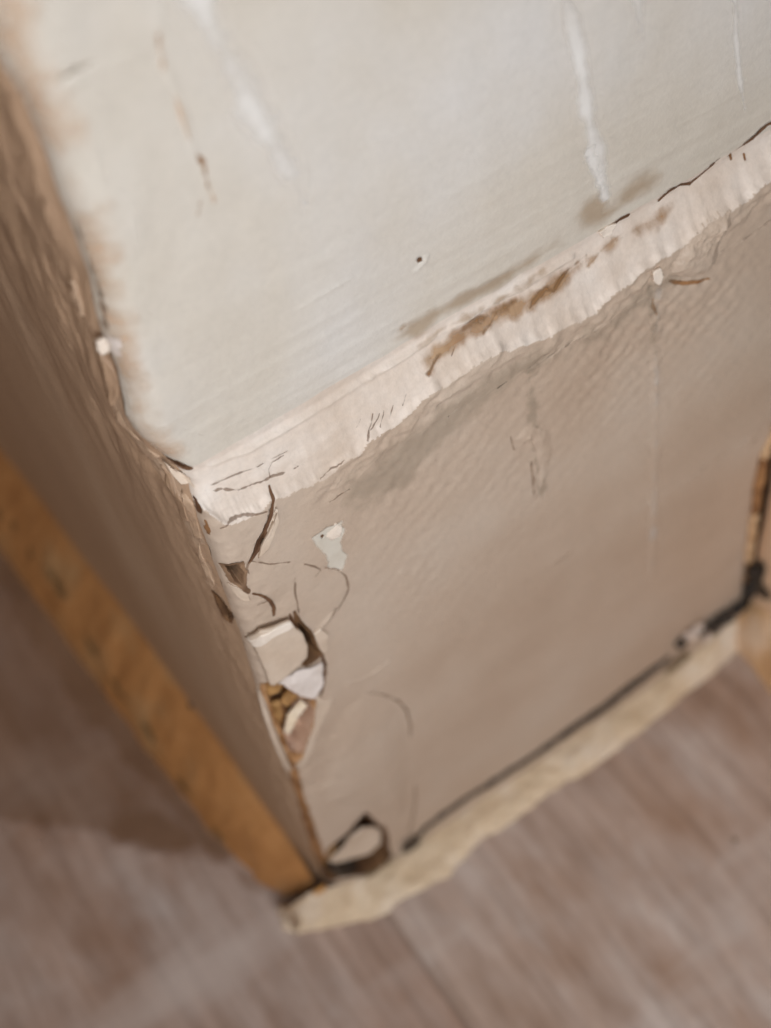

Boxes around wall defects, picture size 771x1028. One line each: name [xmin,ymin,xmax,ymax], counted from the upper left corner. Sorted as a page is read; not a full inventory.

peeling [651,209,732,285]
crack [162,451,349,627]
spalling [245,611,333,772]
spalling [318,813,393,881]